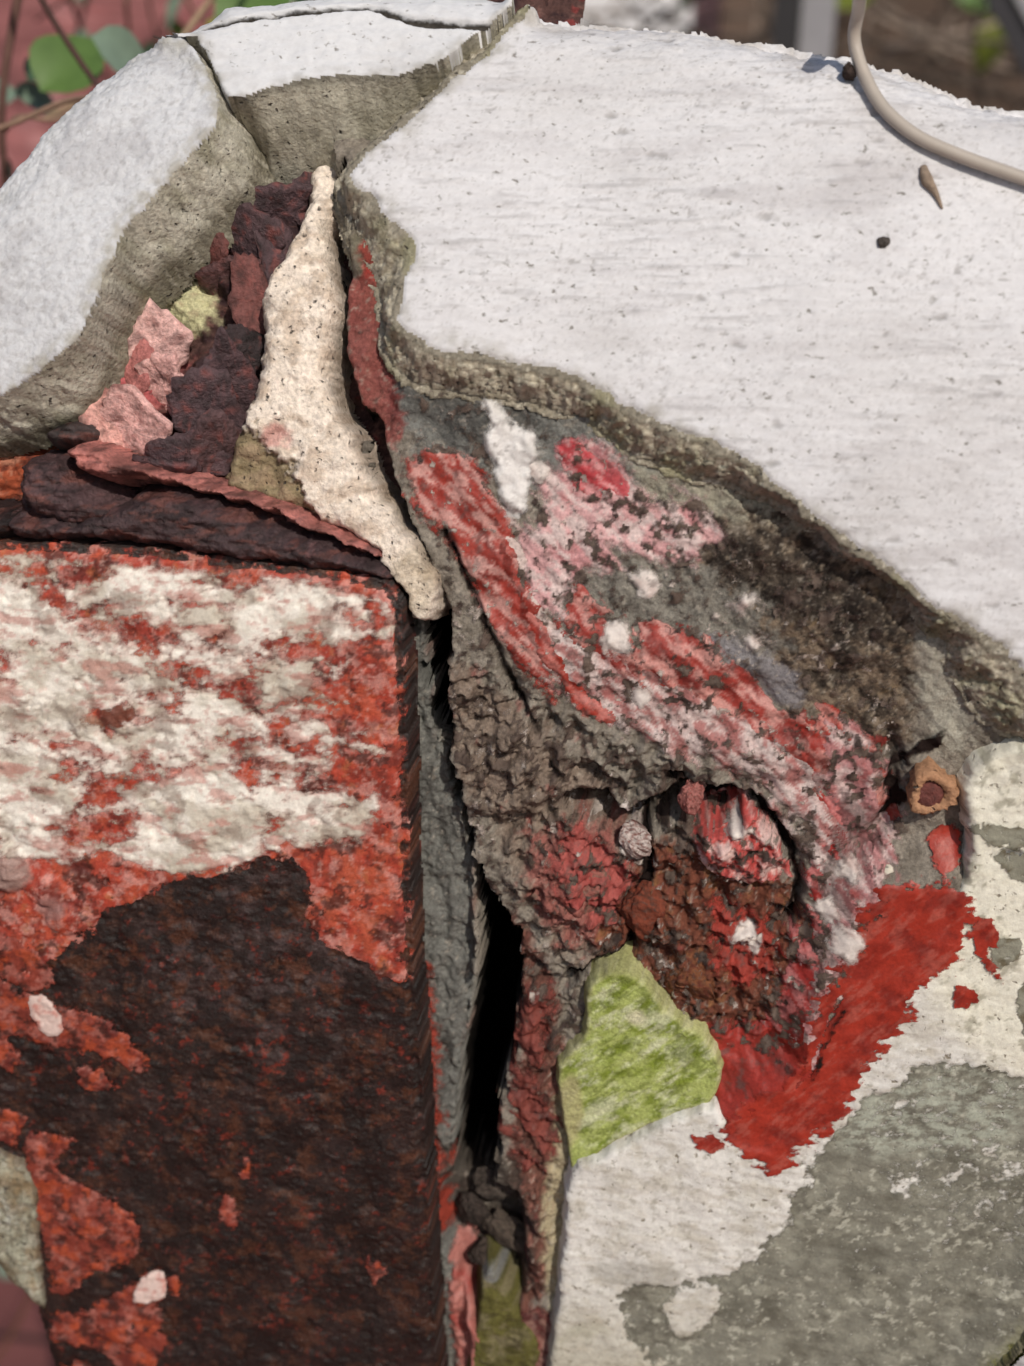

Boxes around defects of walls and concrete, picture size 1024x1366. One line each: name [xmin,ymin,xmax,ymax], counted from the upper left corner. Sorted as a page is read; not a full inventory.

crack [204,8,490,32]
spalling [160,275,236,375]
corrosion [0,171,394,579]
crack [350,362,391,456]
peeling [0,540,417,1073]
crack [426,528,539,1173]
peeling [724,800,753,840]
peeling [731,918,762,953]
peeling [827,922,865,964]
peeling [75,1065,121,1092]
peeling [0,1109,182,1366]
peeling [218,1194,240,1231]